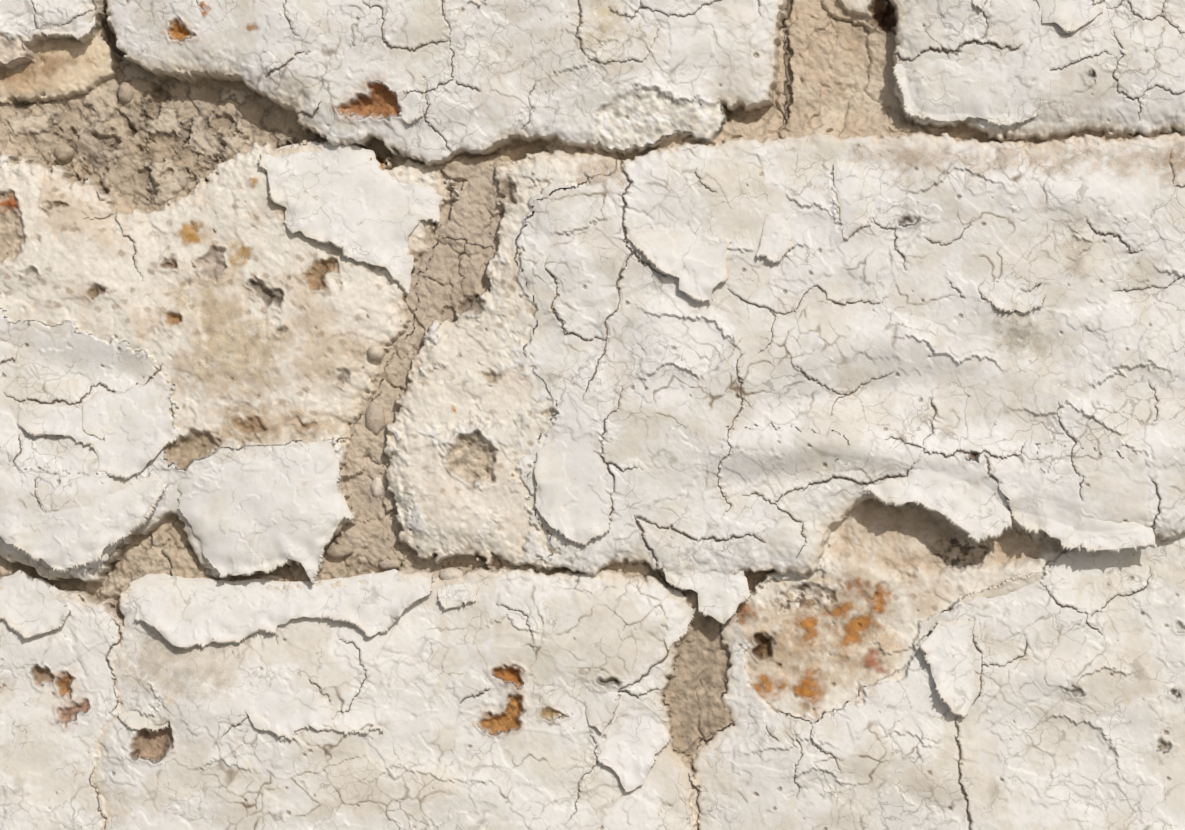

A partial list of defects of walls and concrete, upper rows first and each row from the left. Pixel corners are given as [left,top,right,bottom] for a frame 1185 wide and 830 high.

peeling [40,15,96,40]
crack [759,0,793,130]
spalling [869,0,898,33]
crack [891,9,1020,61]
crack [545,150,664,397]
peeling [0,53,731,649]
crack [600,286,1025,584]
corrosion [737,603,757,623]
corrosion [799,617,816,639]
corrosion [833,579,891,645]
spalling [583,452,1158,793]
corrosion [754,673,820,705]